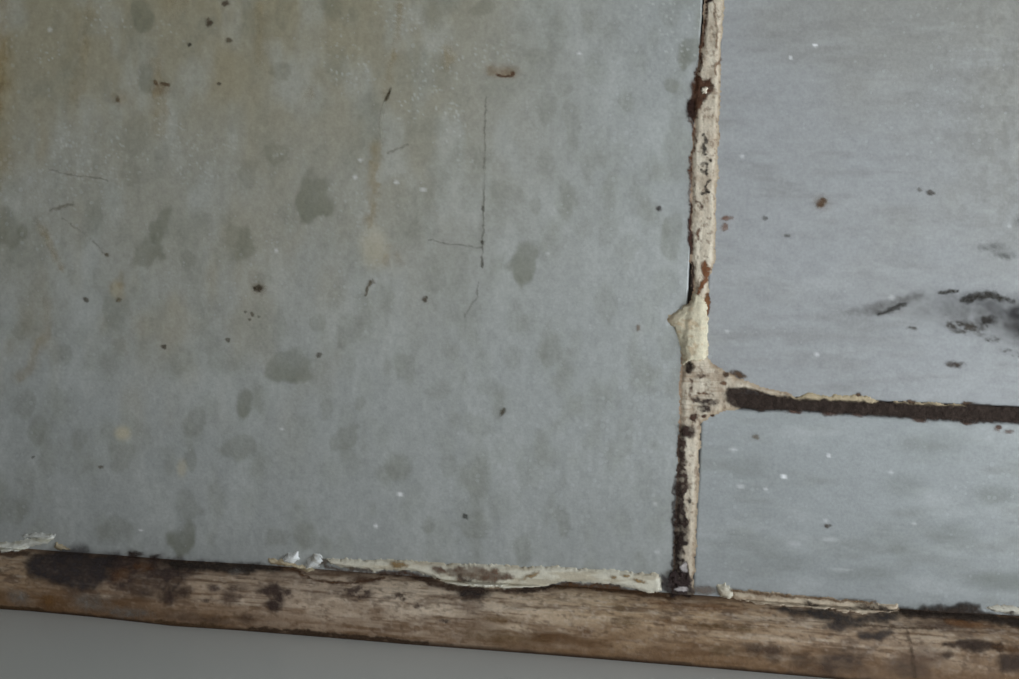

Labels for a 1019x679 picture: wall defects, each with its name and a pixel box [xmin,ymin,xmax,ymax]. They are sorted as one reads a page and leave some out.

leakage [939,290,1019,317]
leakage [947,318,992,333]
peeling [0,532,70,553]
leakage [0,549,282,604]
leakage [324,562,555,600]
peeling [268,551,662,593]
leakage [262,584,291,611]
leakage [780,601,1019,640]
leakage [943,640,1019,671]